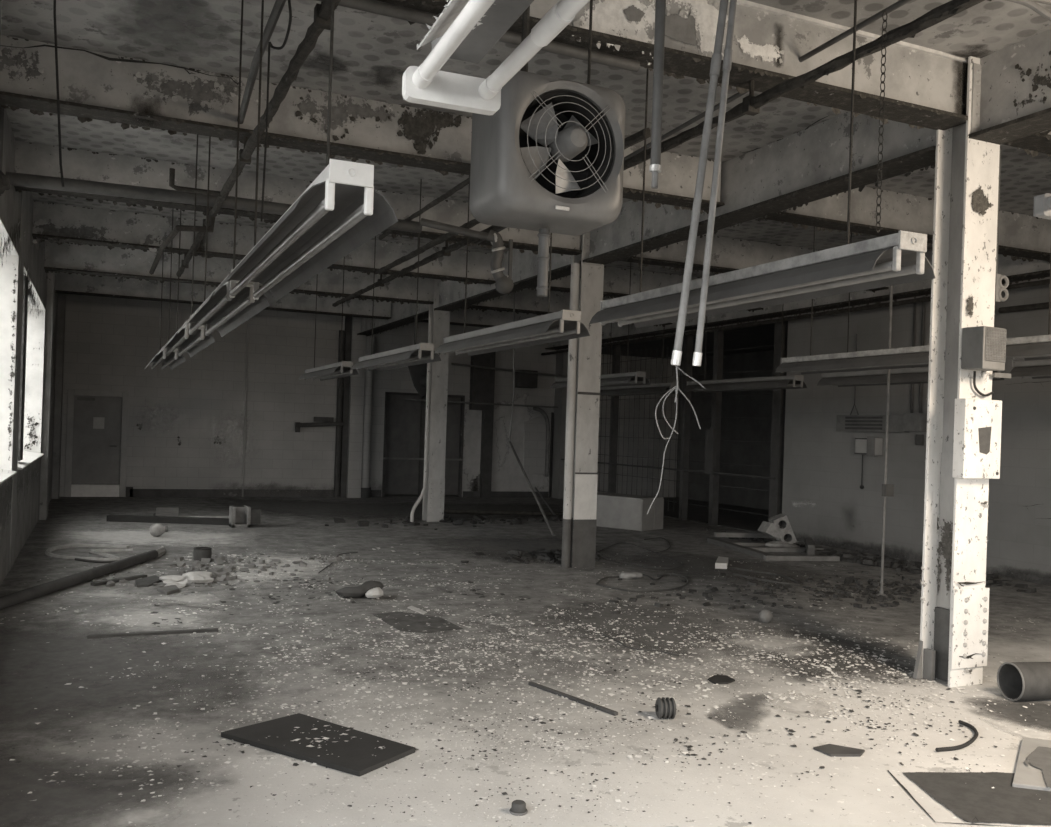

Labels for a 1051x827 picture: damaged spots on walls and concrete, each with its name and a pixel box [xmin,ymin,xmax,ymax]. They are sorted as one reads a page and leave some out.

peeling [572,0,785,65]
peeling [0,47,44,81]
crack [0,44,239,85]
peeling [130,71,239,115]
spalling [1013,51,1051,115]
spalling [293,92,463,155]
spalling [966,184,998,219]